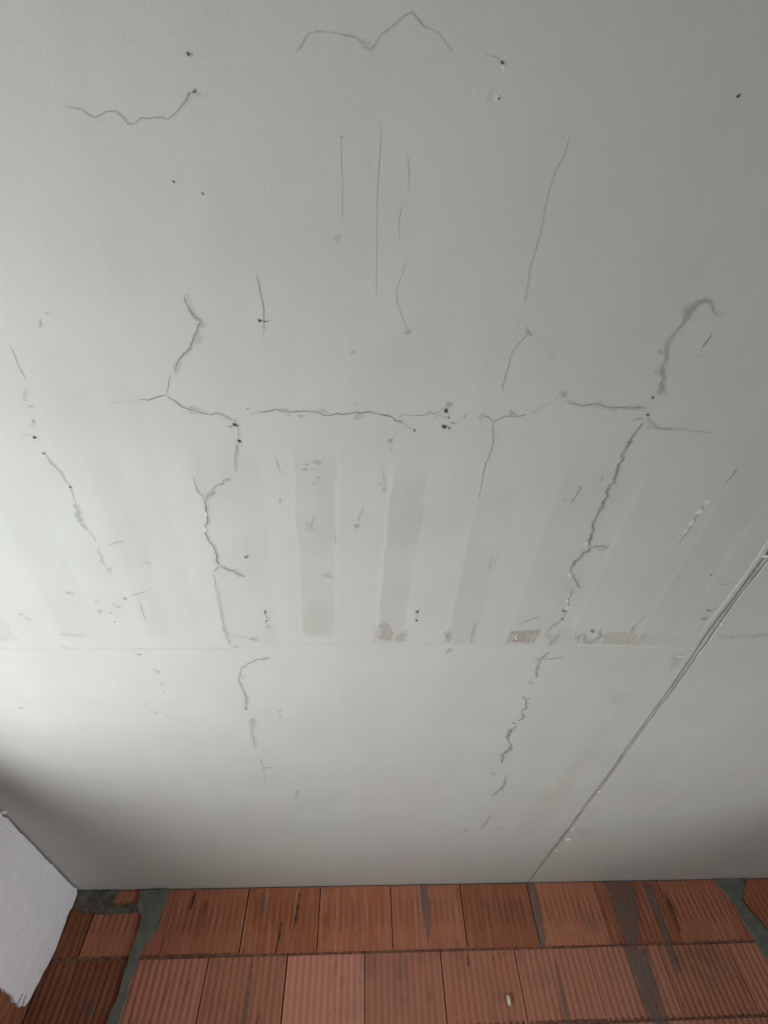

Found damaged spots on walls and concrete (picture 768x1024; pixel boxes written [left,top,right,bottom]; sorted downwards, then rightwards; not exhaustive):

crack [64,90,192,127]
crack [295,11,452,56]
crack [10,346,114,574]
crack [109,292,437,711]
crack [463,136,715,832]